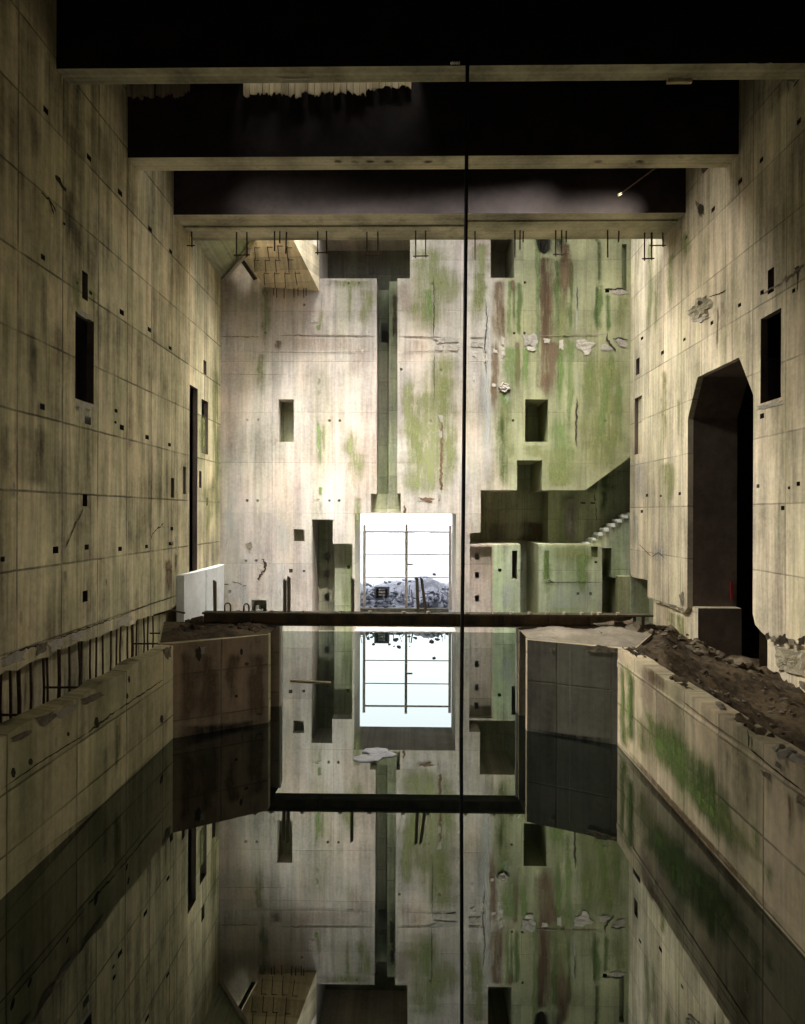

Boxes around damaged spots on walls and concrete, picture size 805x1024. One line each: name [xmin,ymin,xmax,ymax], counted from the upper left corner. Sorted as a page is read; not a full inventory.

leakage [413,251,457,322]
spalling [433,299,511,393]
rust [491,281,515,402]
rust [539,244,572,394]
spalling [523,334,628,355]
leakage [403,360,455,490]
rust [416,415,444,505]
crack [572,401,580,446]
spalling [0,609,185,742]
leakage [620,669,642,749]
spalling [765,632,805,691]